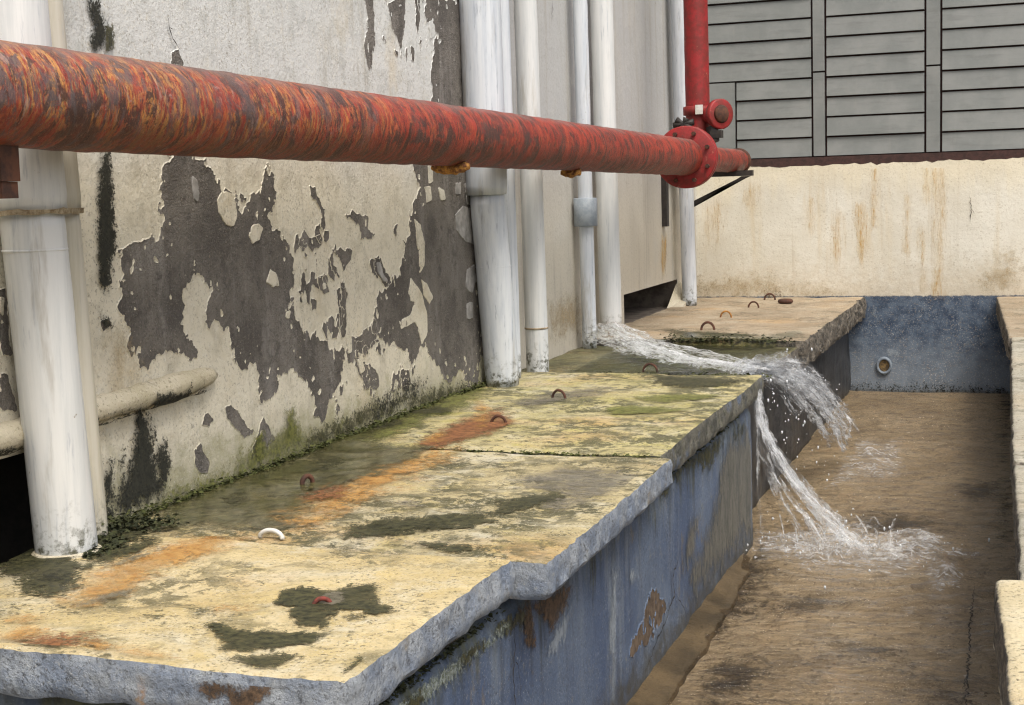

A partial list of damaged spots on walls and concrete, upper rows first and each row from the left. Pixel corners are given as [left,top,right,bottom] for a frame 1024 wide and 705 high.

peeling [363,0,463,107]
damp [95,152,119,292]
peeling [99,155,483,459]
damp [98,374,455,536]
rust [284,406,515,525]
rust [57,536,240,607]
rust [199,681,271,705]
spalling [629,587,667,659]
crack [962,586,975,703]